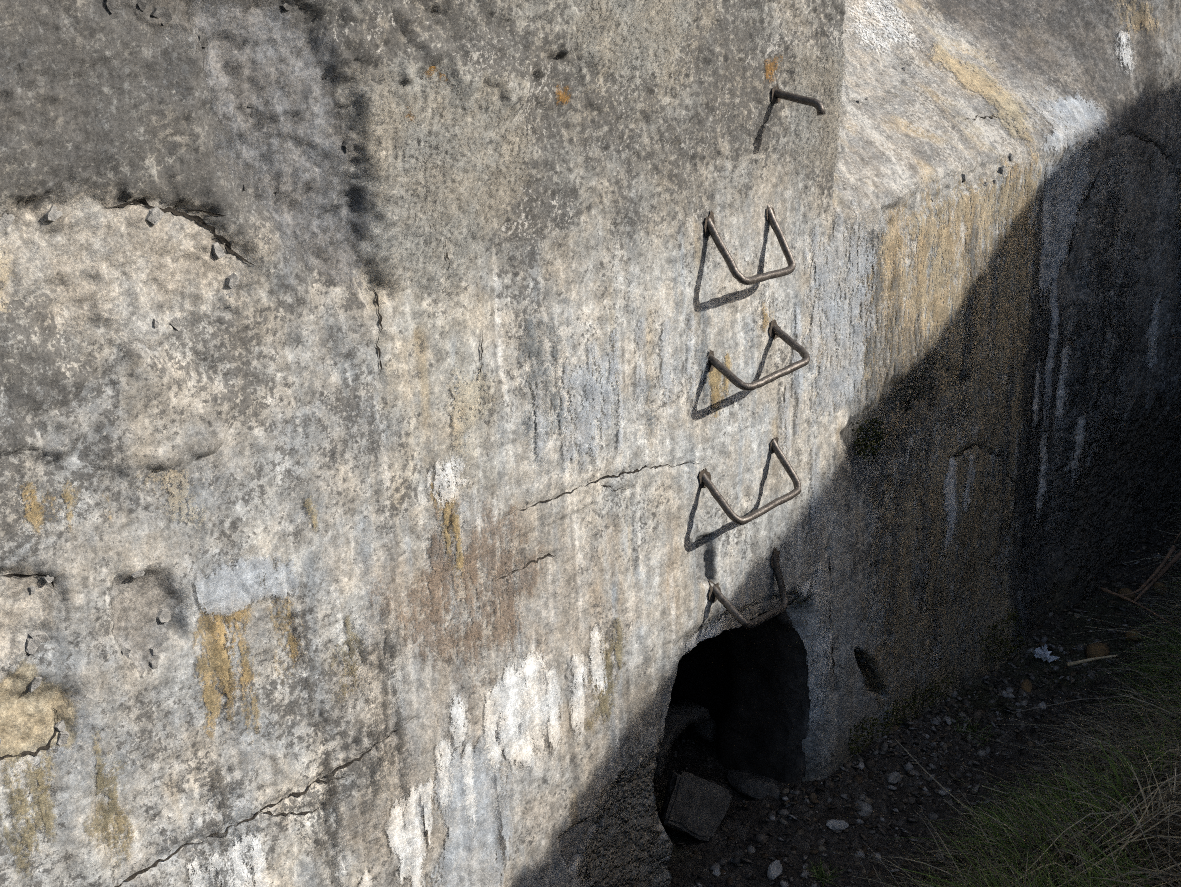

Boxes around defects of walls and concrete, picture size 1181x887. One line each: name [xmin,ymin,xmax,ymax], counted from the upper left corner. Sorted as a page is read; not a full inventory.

crack [110,198,256,266]
water stain [847,0,1161,648]
crack [504,462,700,517]
crack [954,444,1017,511]
crack [0,574,62,597]
crack [498,553,556,580]
spalling [0,565,76,766]
crack [0,707,58,760]
crack [114,718,413,887]
spalling [559,740,673,887]